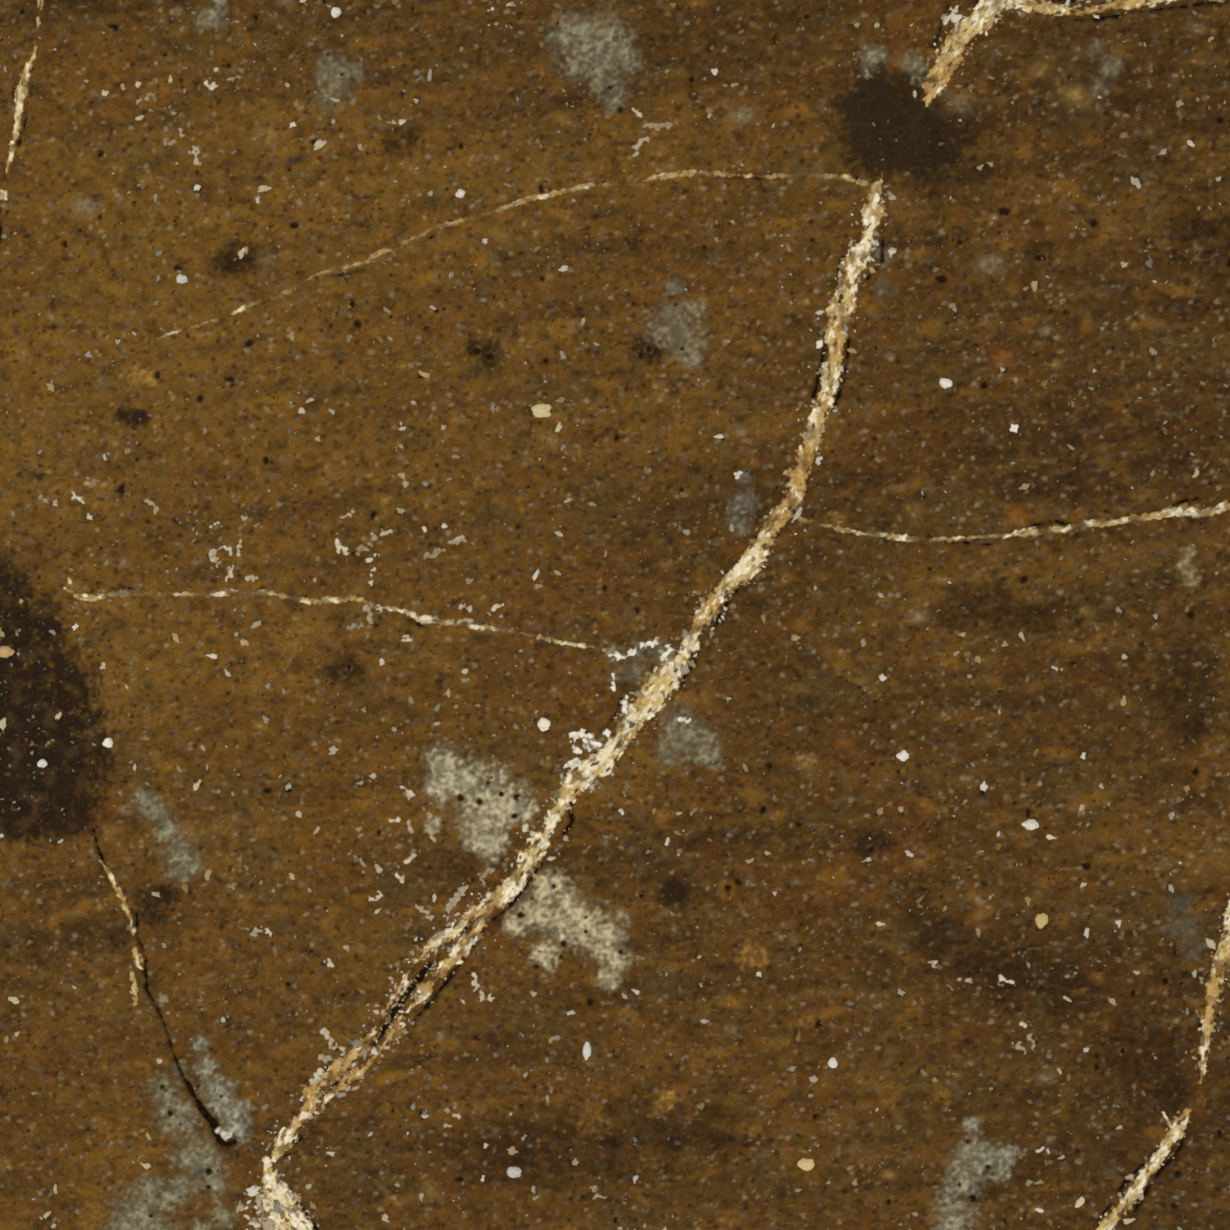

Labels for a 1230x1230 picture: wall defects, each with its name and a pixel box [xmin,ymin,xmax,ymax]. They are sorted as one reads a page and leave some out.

crack [920,0,1226,107]
crack [0,0,44,241]
crack [642,169,789,182]
water stain [836,65,965,181]
crack [156,218,465,339]
crack [63,577,133,609]
crack [174,565,504,642]
water stain [0,555,108,846]
crack [243,173,1230,1230]
crack [92,828,237,1147]